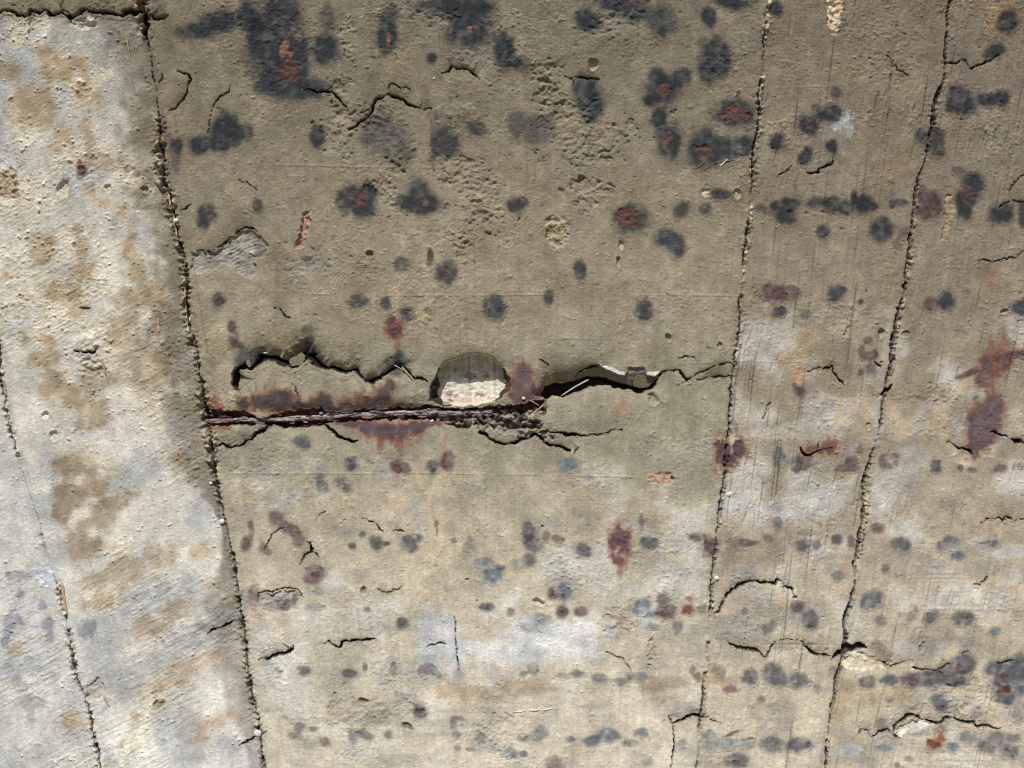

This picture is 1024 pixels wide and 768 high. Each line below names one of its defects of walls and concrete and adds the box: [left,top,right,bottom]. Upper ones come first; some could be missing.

rust [170,0,344,111]
damp [826,107,859,139]
spalling [190,230,269,278]
spalling [206,409,361,430]
rust [205,290,456,495]
spalling [377,352,554,441]
damp [717,438,932,568]
rust [450,512,662,586]
crack [712,578,795,615]
damp [412,595,620,703]
crack [727,639,969,674]
crack [858,713,1002,739]